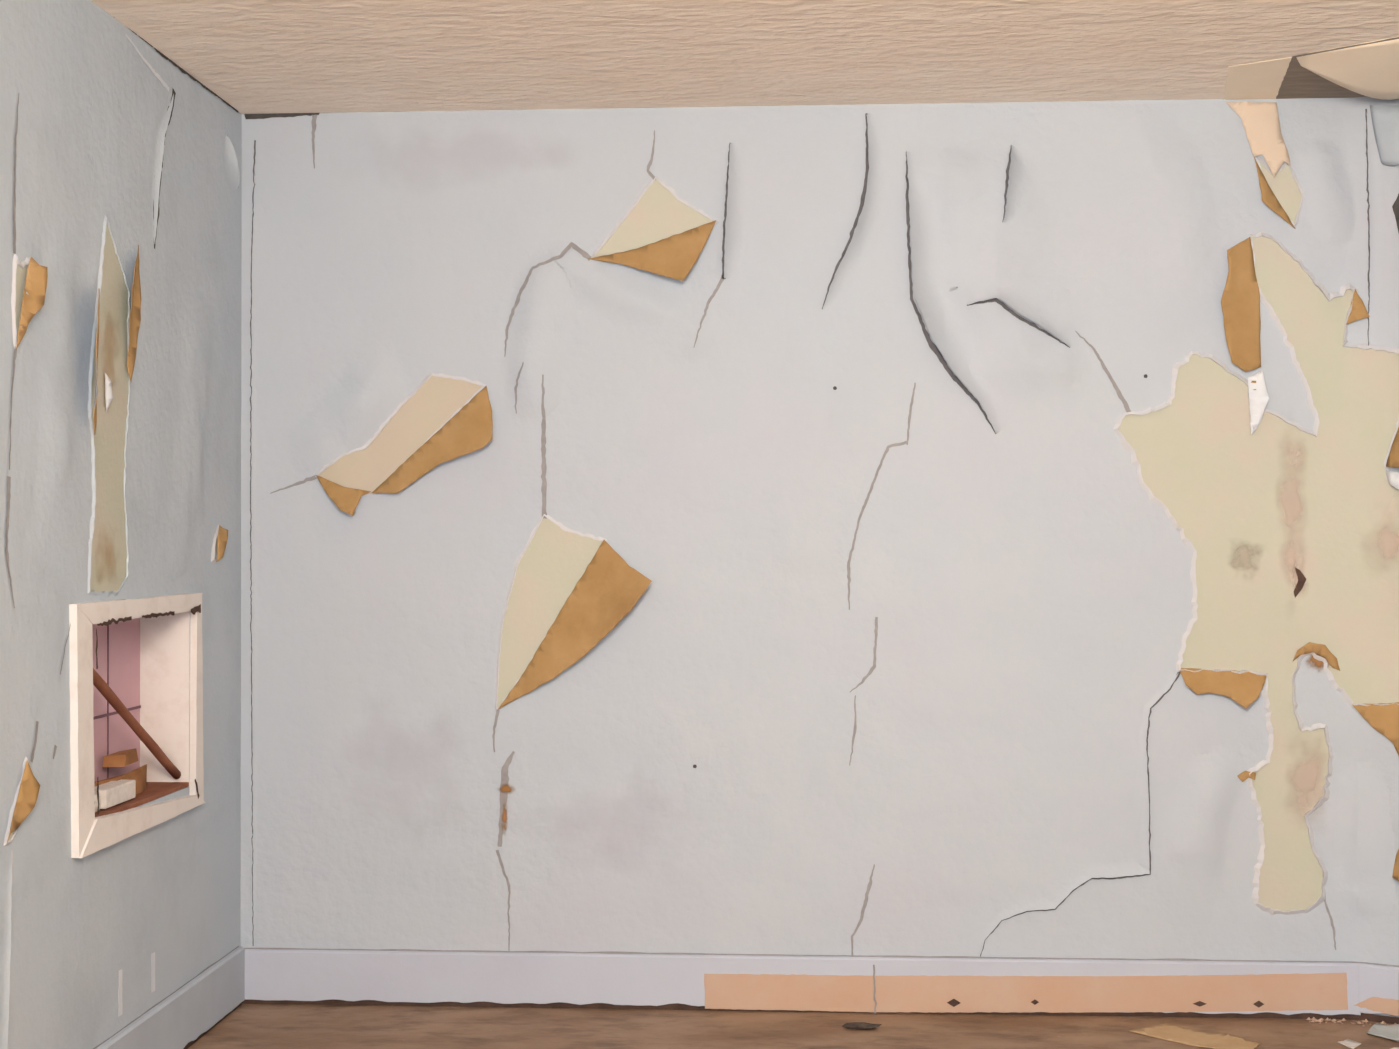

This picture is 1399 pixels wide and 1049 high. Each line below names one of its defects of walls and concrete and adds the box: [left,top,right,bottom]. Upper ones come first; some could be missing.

crack [114,17,319,169]
peeling [1276,37,1399,100]
peeling [87,215,141,597]
peeling [270,373,493,516]
peeling [504,130,719,357]
crack [693,275,724,348]
crack [1075,331,1131,412]
peeling [492,374,651,752]
crack [847,383,916,766]
peeling [1113,232,1399,915]
crack [496,751,515,952]
crack [851,864,877,1014]